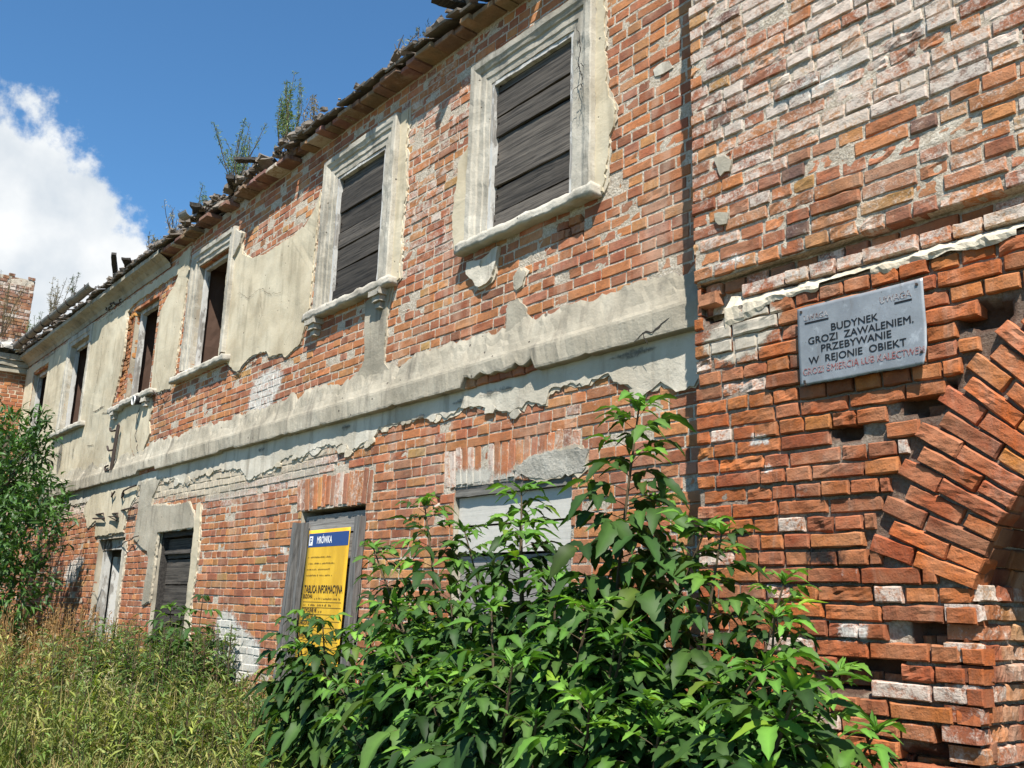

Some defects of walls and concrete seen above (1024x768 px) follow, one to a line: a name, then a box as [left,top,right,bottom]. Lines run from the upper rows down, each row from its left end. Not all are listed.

peeling [218,193,322,375]
peeling [357,107,412,379]
peeling [465,246,501,291]
peeling [505,267,530,332]
crack [634,318,669,344]
peeling [707,222,1024,328]
peeling [48,331,699,652]